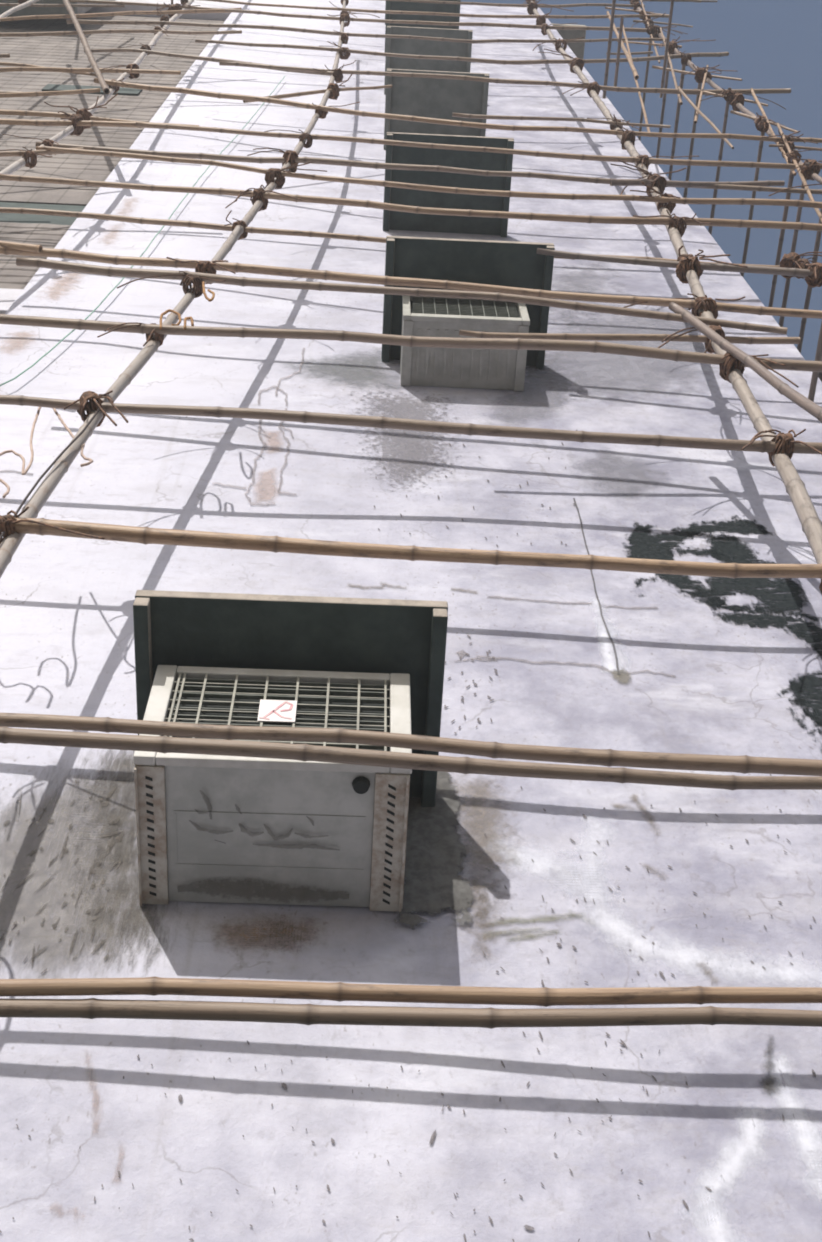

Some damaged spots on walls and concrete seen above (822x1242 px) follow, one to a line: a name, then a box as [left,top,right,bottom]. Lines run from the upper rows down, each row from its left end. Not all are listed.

water stain [302,356,459,492]
crack [573,498,620,675]